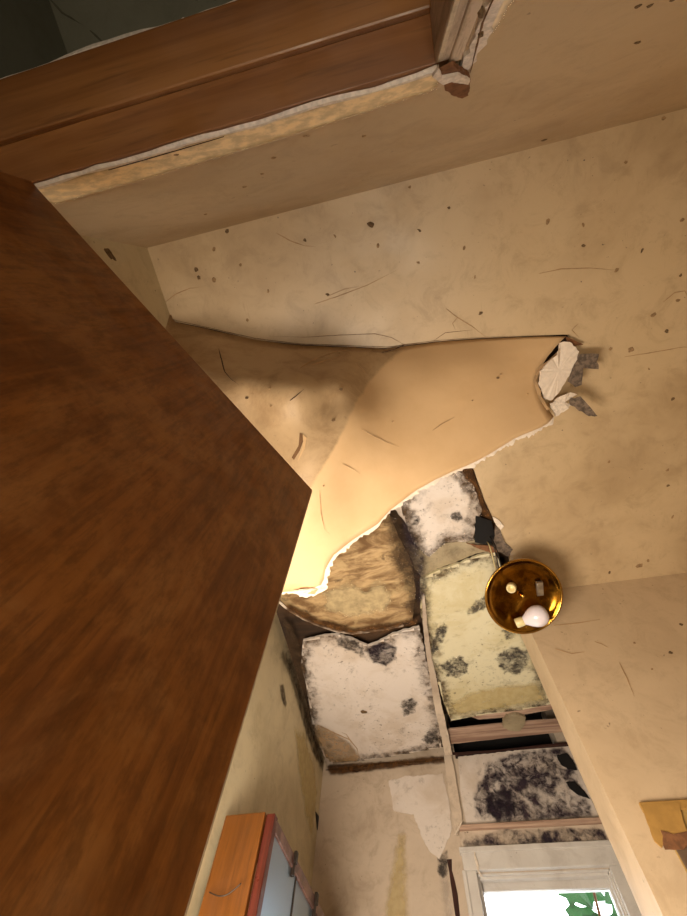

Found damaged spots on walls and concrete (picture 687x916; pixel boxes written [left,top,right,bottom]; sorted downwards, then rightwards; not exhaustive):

spalling [34,0,504,189]
damp [461,468,492,519]
damp [279,514,446,774]
mould [440,657,468,678]
mould [499,648,527,674]
peeling [389,774,452,859]
damp [438,859,447,877]
mould [468,835,502,846]
flaking render [458,746,599,824]
mould [474,747,607,844]